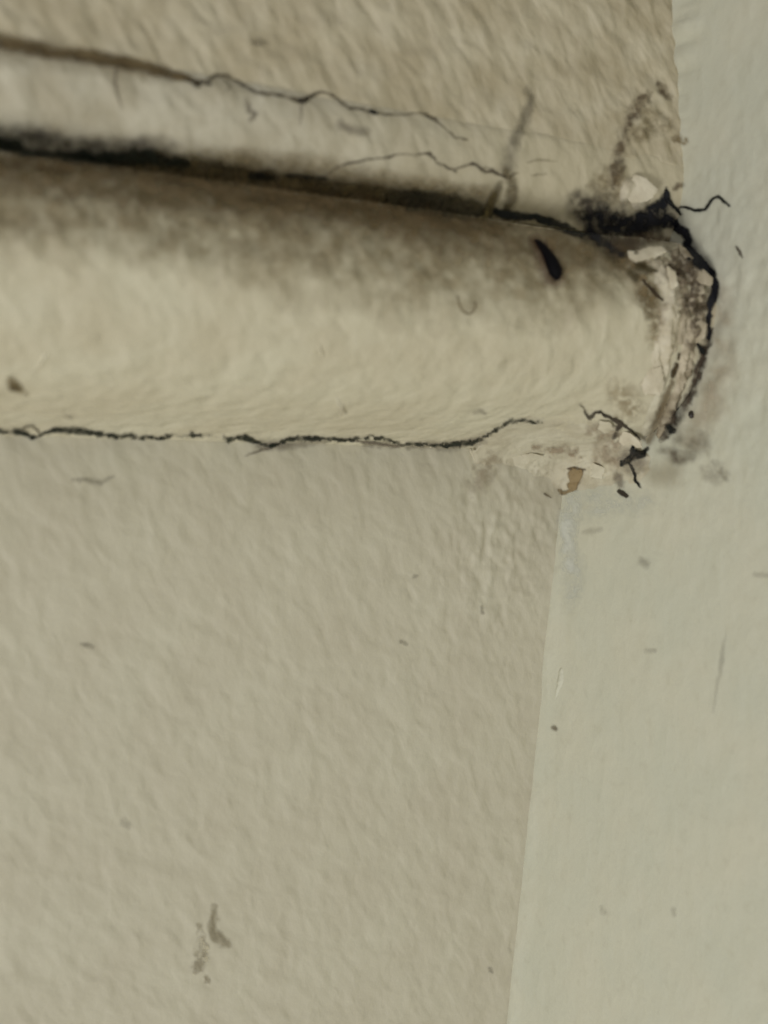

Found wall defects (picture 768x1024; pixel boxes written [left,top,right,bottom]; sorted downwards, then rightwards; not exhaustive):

crack [184,73,507,178]
water stain [600,95,648,196]
water stain [0,138,681,316]
crack [580,185,730,440]
crack [0,418,539,449]
spalling [544,420,649,498]